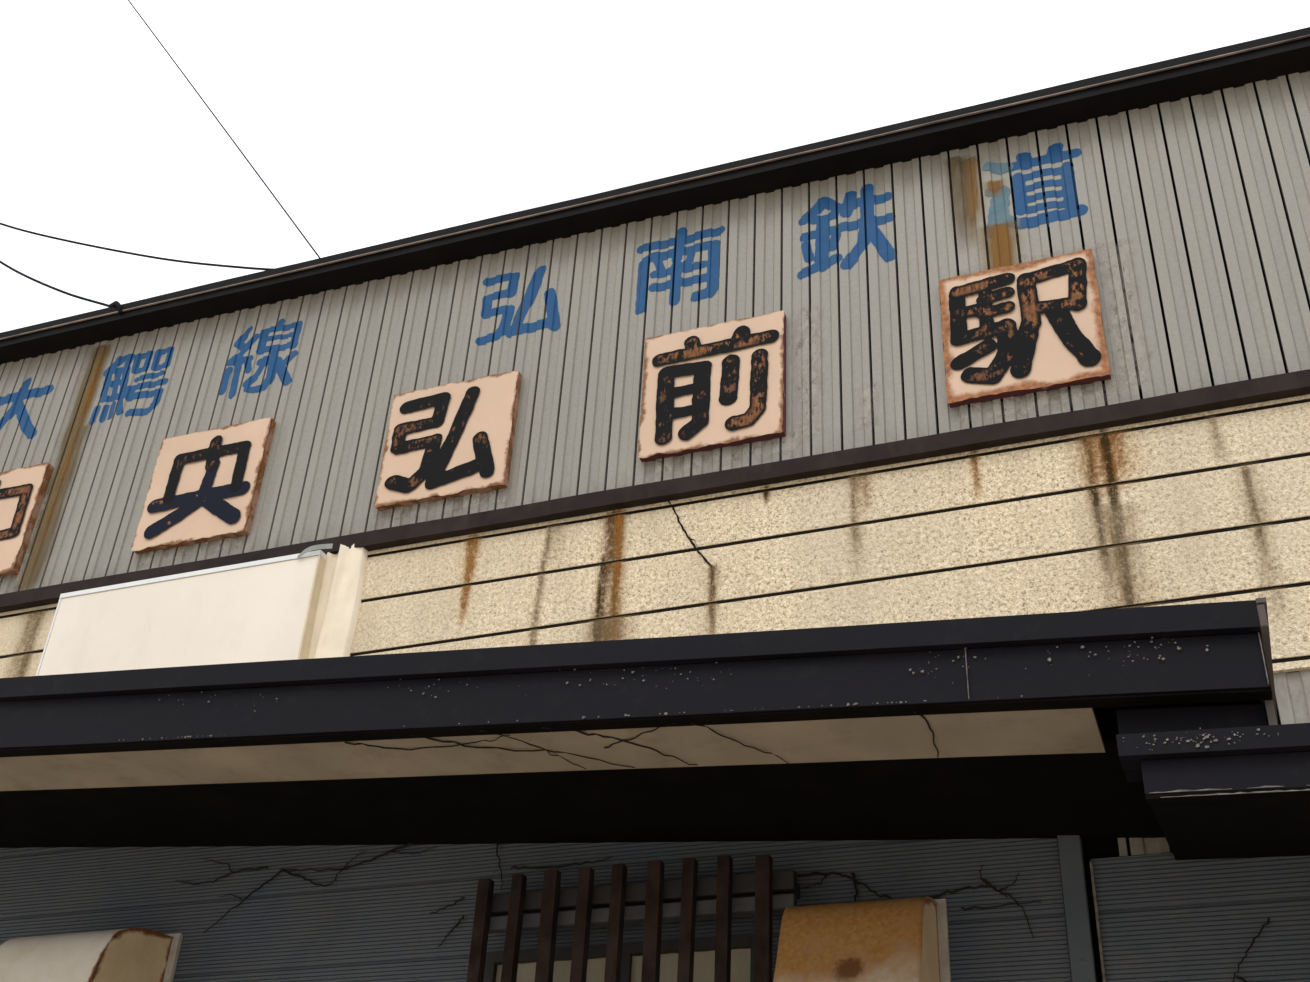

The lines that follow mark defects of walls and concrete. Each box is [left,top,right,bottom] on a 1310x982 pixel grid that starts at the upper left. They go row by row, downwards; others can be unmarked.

corrosion [947,156,1013,268]
corrosion [461,535,477,613]
corrosion [593,509,623,641]
crack [668,501,713,584]
corrosion [1083,428,1137,608]
water stain [1242,466,1263,542]